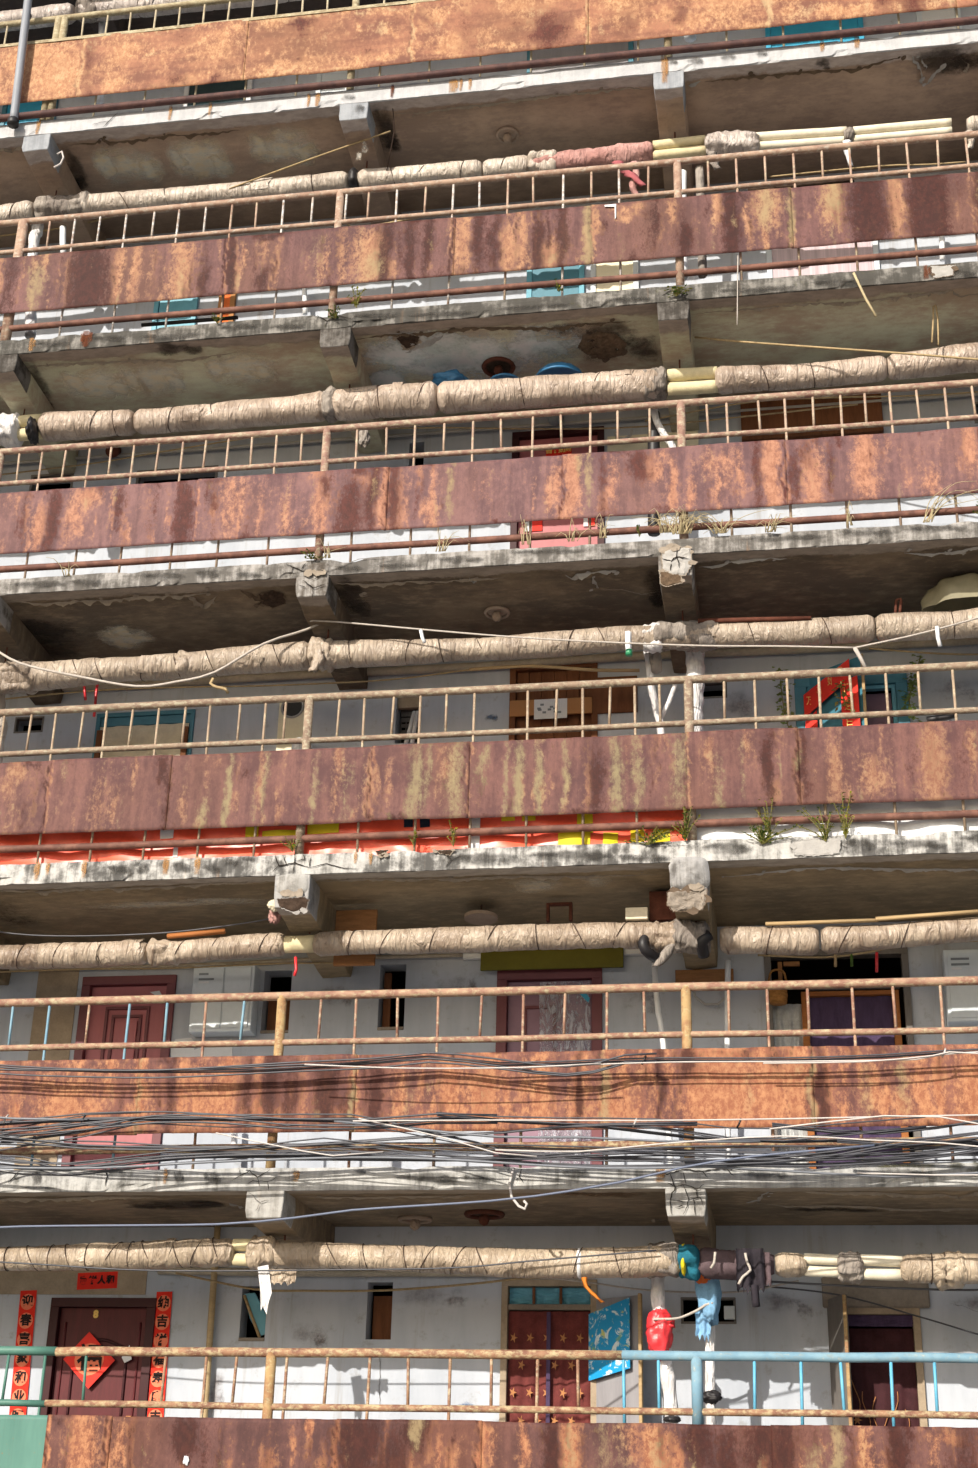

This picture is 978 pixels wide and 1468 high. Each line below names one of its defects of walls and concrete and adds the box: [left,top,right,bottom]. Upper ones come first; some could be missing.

spalling [658,543,785,587]
crack [653,1169,745,1216]